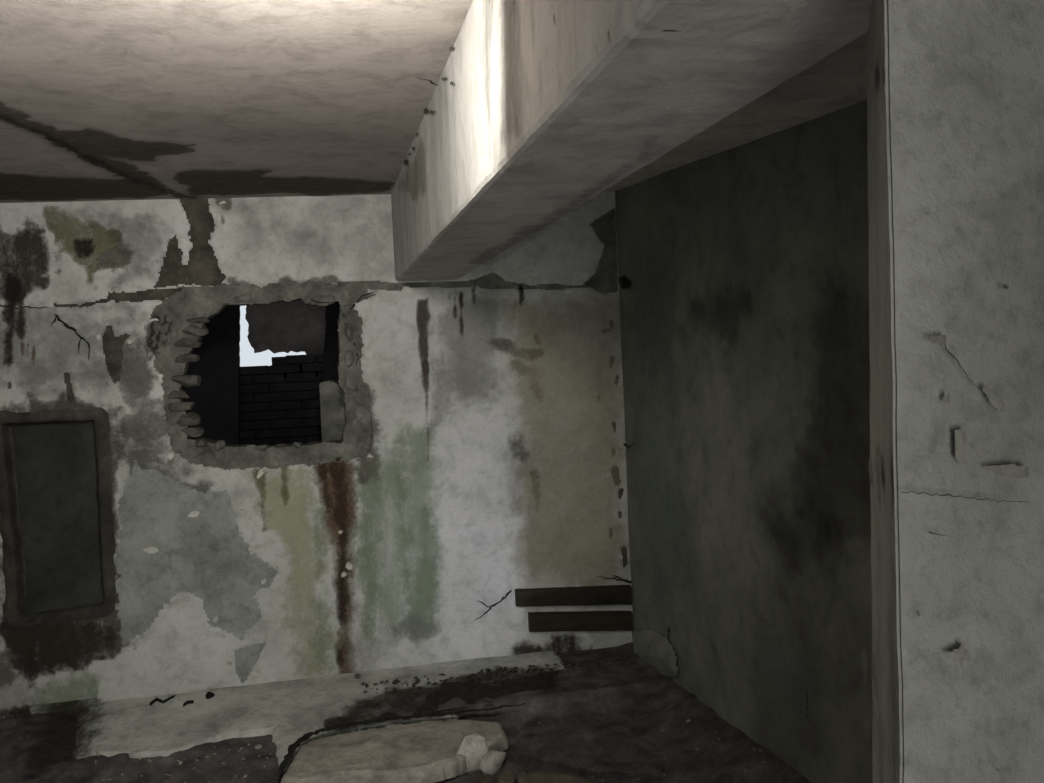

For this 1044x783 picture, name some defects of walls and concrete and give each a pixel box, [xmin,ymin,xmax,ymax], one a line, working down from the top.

damp [0,102,394,366]
crack [0,305,90,360]
flaking render [53,199,618,479]
corrosion [416,299,430,406]
crack [945,344,980,389]
damp [352,394,379,481]
damp [0,315,209,686]
flaking render [607,447,624,539]
peeling [115,460,278,683]
corrosion [314,459,366,674]
crack [474,590,512,621]
damp [0,699,103,771]